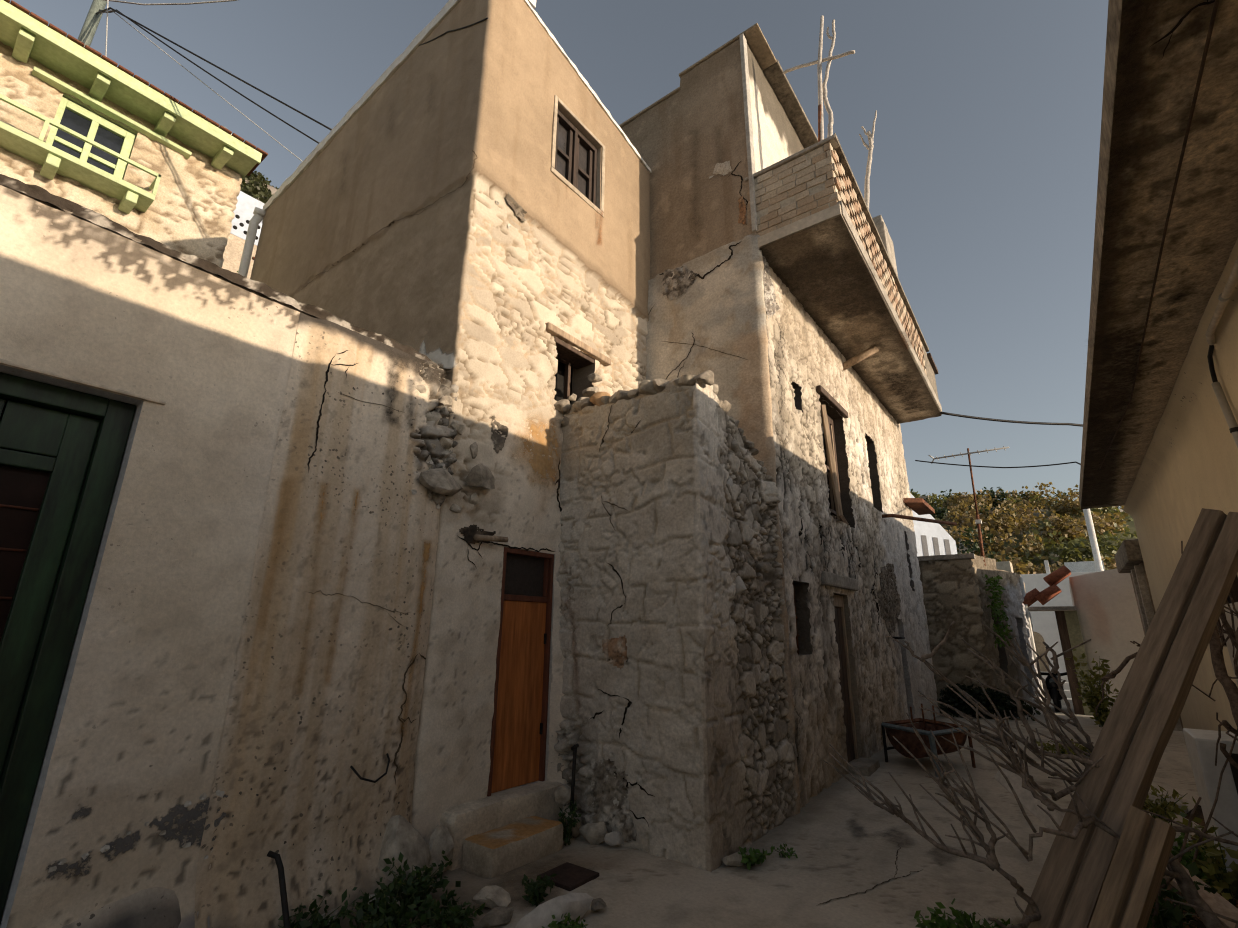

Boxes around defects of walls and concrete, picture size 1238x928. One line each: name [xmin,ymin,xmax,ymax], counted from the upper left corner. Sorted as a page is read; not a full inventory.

crack [728,161,748,210]
crack [303,150,477,288]
crack [659,241,742,279]
crack [663,333,747,380]
crack [307,350,405,473]
damp [1086,325,1148,506]
crack [305,590,409,625]
crack [607,563,626,629]
crack [394,653,426,784]
crack [590,689,632,738]
crack [614,772,655,826]
peeling [47,790,228,880]